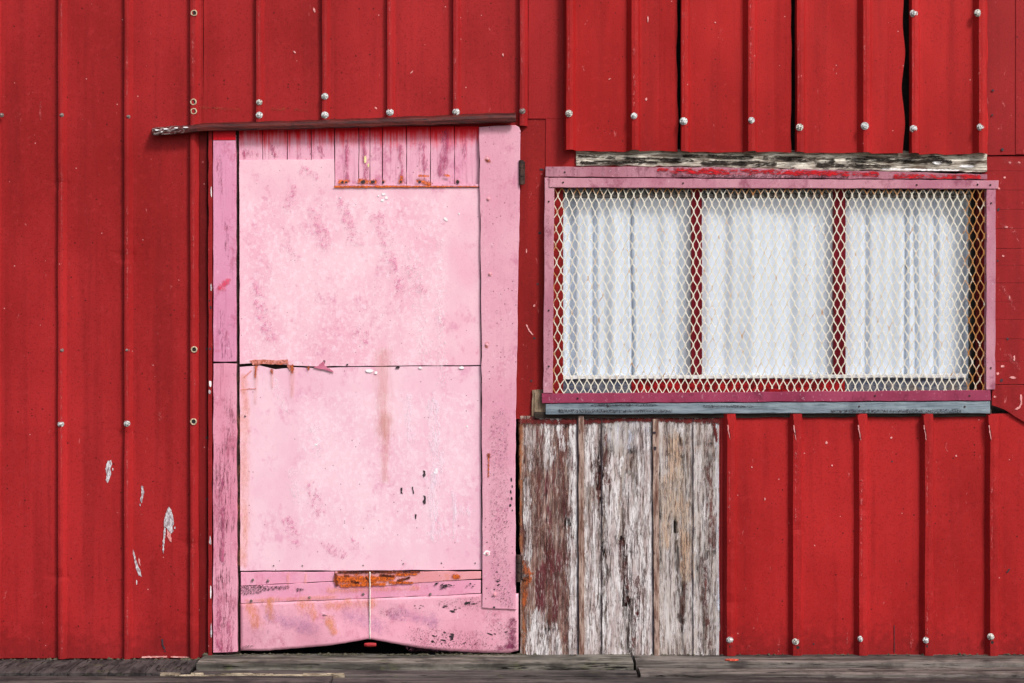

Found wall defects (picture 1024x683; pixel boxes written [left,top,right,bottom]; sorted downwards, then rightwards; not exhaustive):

peeling [657,161,981,179]
corrosion [334,174,479,188]
corrosion [250,359,294,378]
peeling [163,507,176,552]
peeling [509,415,734,660]
corrosion [334,573,417,588]